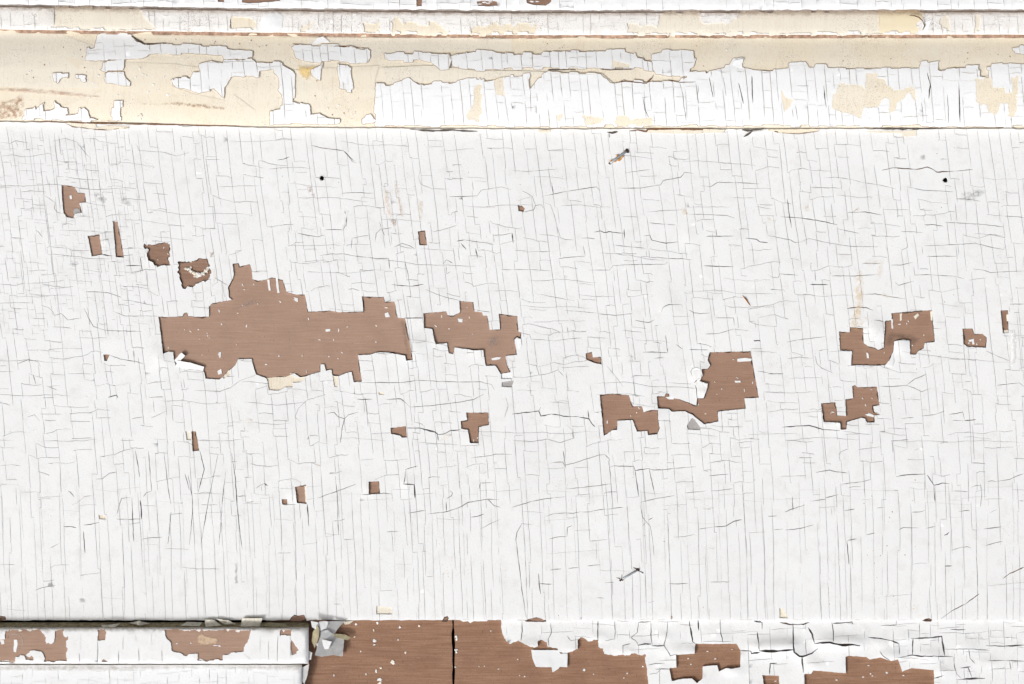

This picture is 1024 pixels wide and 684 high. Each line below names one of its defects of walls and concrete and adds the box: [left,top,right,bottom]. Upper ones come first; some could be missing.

crack [410,126,477,134]
crack [771,199,1024,322]
peeling [158,263,413,391]
peeling [423,300,522,387]
peeling [839,310,935,366]
crack [331,380,494,443]
peeling [599,340,760,435]
crack [63,451,267,550]
crack [307,451,733,639]
peeling [263,606,648,684]
crack [548,594,1022,680]
peeling [804,656,934,684]